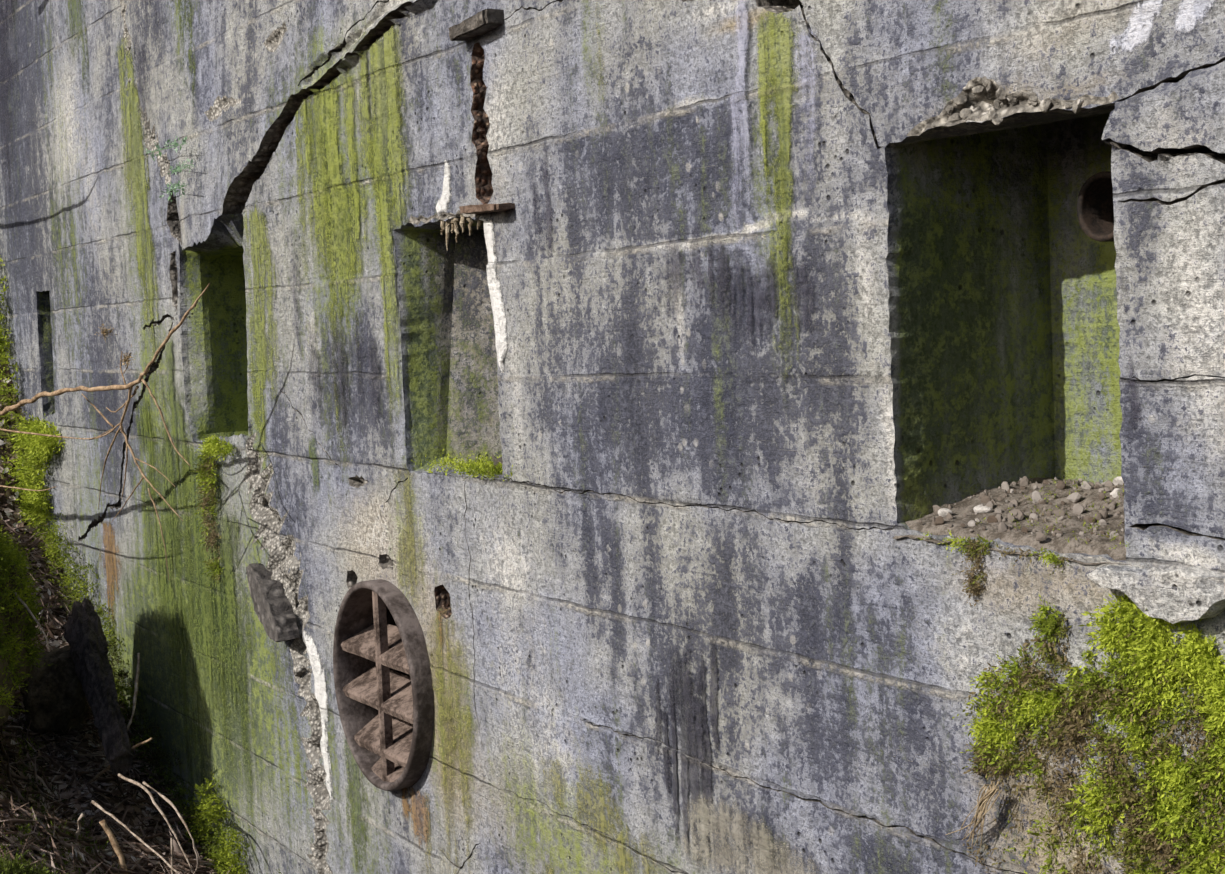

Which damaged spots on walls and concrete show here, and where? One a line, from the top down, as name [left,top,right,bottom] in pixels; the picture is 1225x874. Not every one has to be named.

crack [504,0,563,20]
spalling [756,0,804,14]
crack [222,0,420,215]
crack [801,8,885,149]
spalling [906,76,1119,136]
crack [1129,57,1225,98]
crack [1108,142,1225,205]
spalling [434,585,452,619]
peeling [1086,565,1225,624]
spalling [243,431,333,874]